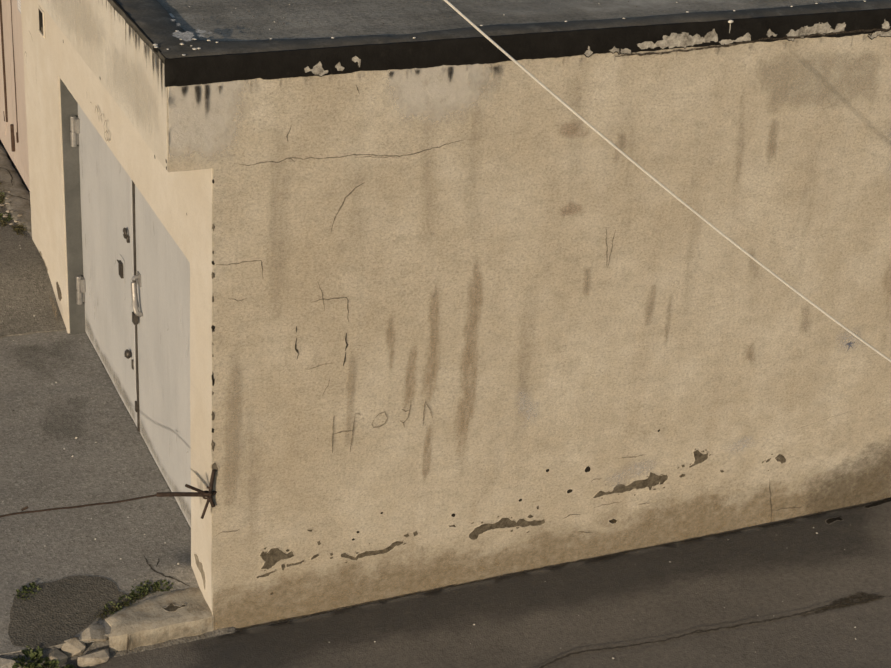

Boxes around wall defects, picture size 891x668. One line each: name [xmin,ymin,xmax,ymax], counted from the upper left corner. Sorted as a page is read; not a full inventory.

peeling [608,28,752,55]
peeling [766,21,846,41]
peeling [867,18,891,40]
water stain [106,0,244,153]
peeling [303,55,362,77]
spalling [592,448,712,499]
spalling [468,505,546,541]
spalling [255,529,419,579]
water stain [214,462,889,628]